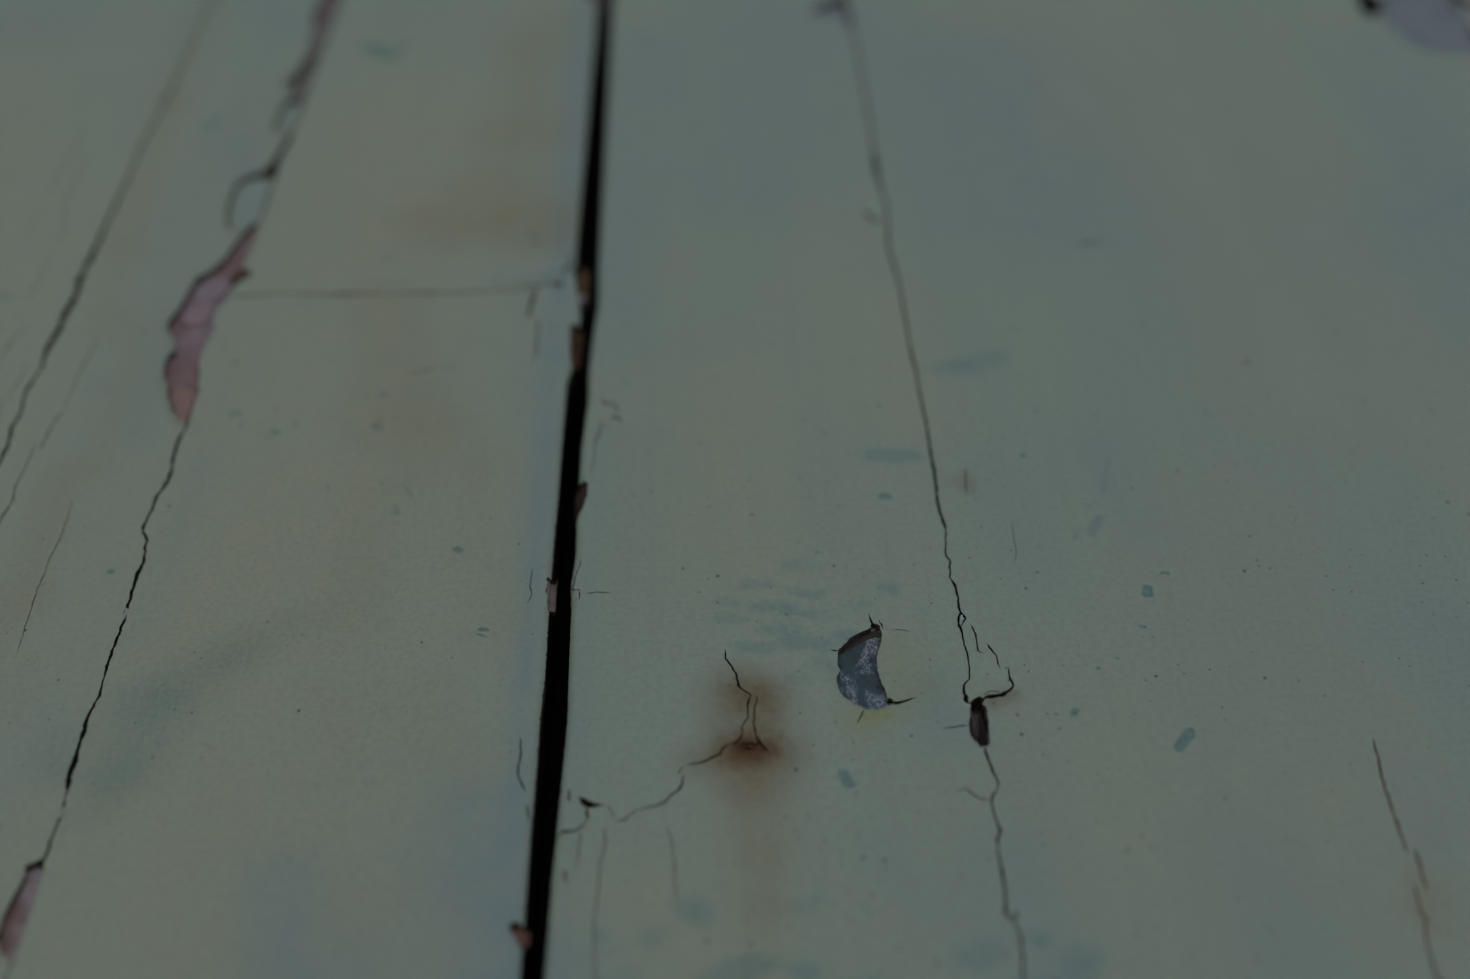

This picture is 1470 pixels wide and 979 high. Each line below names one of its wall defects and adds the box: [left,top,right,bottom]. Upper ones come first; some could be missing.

peeling [257,131,292,179]
peeling [285,0,342,114]
peeling [1357,0,1470,56]
crack [0,0,213,522]
peeling [163,222,258,427]
peeling [0,859,44,979]
crack [17,501,73,652]
crack [41,423,188,868]
crack [556,650,769,864]
peeling [830,615,917,723]
crack [844,1,1025,979]
crack [1372,738,1440,979]